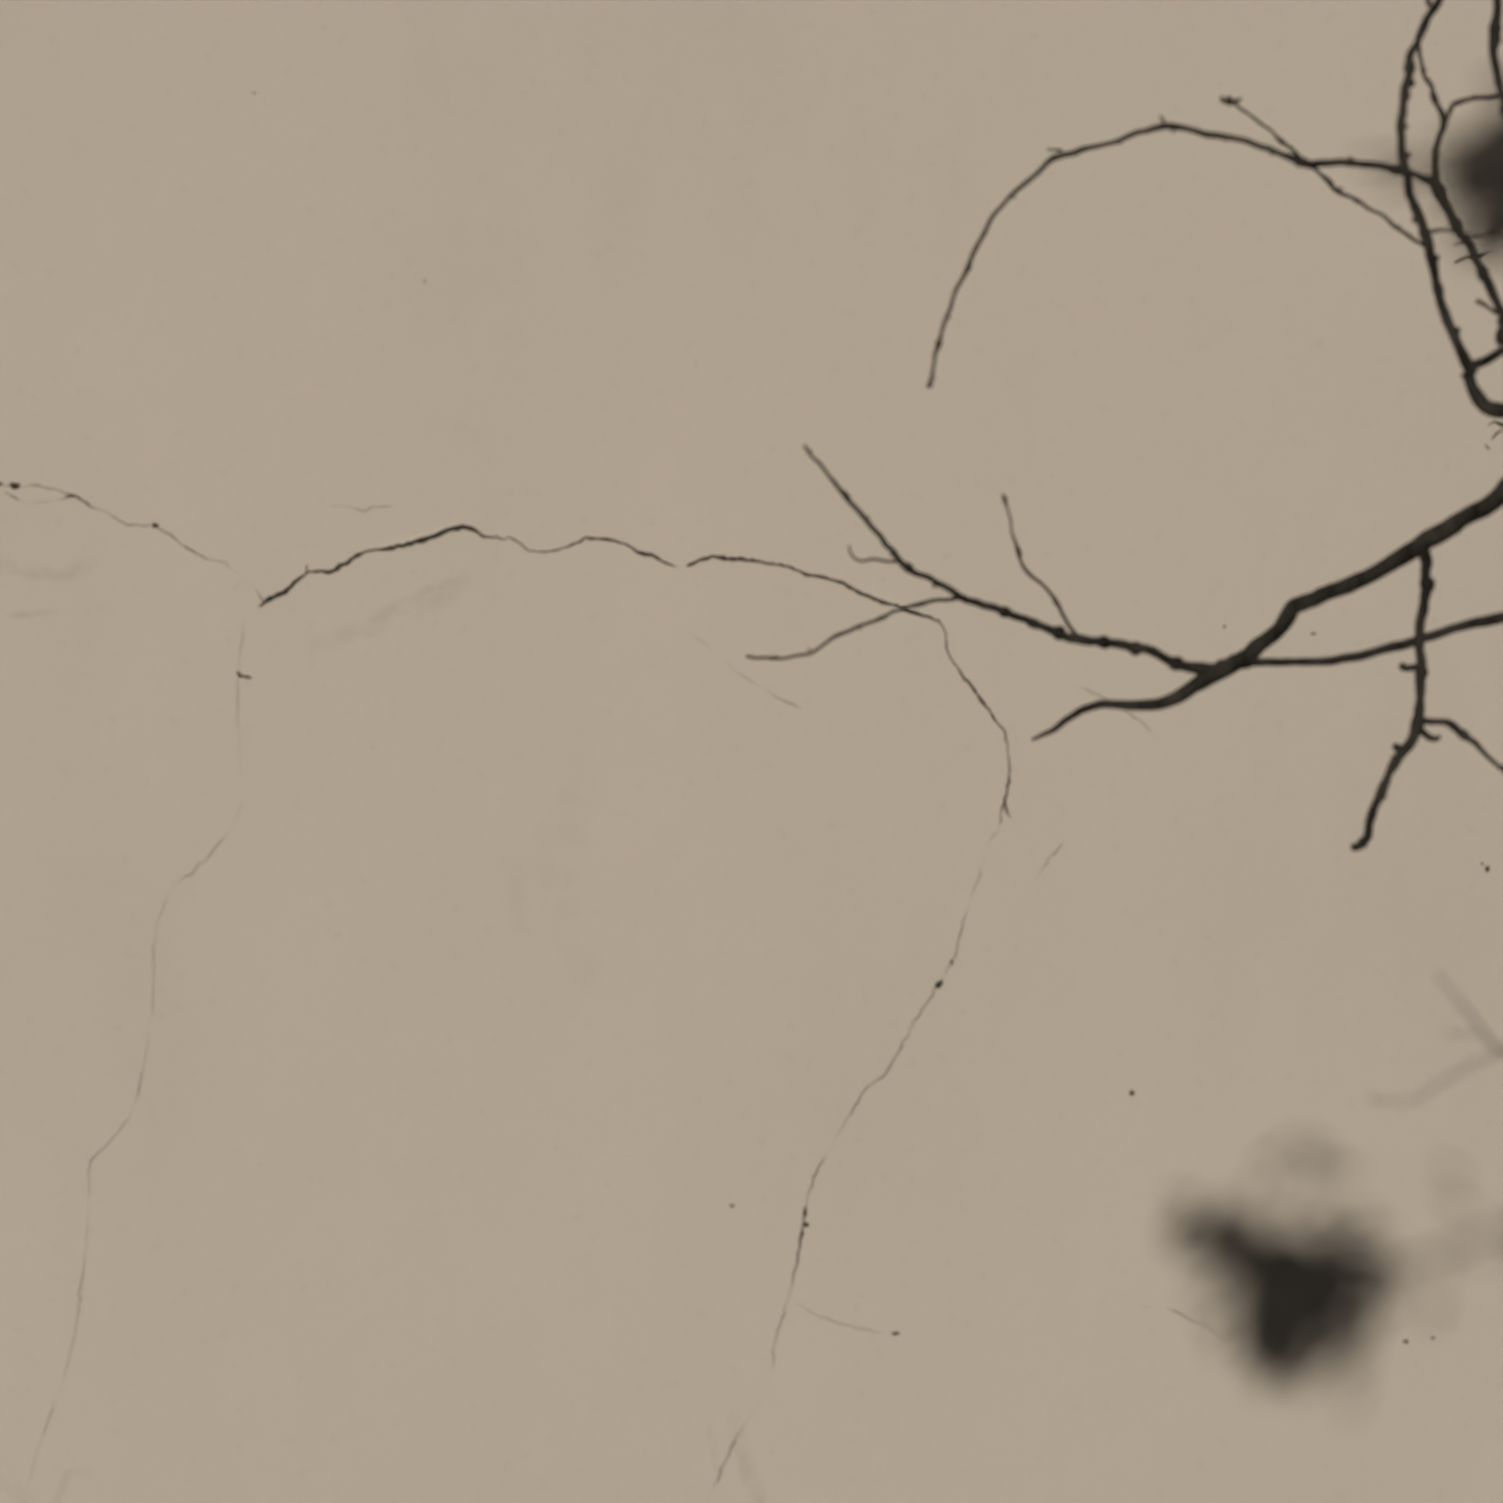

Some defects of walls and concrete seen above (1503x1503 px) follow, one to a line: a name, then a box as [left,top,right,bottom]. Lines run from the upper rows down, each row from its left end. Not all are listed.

crack [0,482,1011,1486]